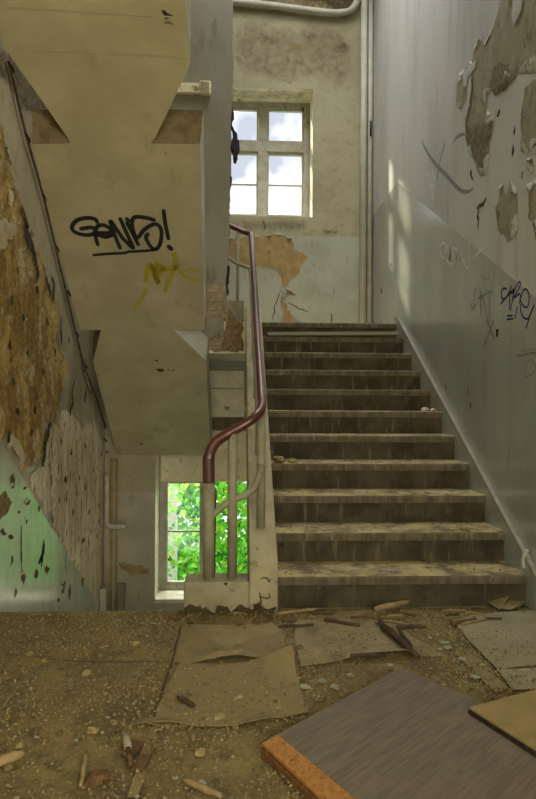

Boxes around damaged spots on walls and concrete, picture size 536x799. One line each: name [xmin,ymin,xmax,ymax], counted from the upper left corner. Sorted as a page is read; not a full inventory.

peeling [456,0,536,243]
flaking render [0,122,105,586]
peeling [201,233,308,353]
spalling [15,565,50,597]